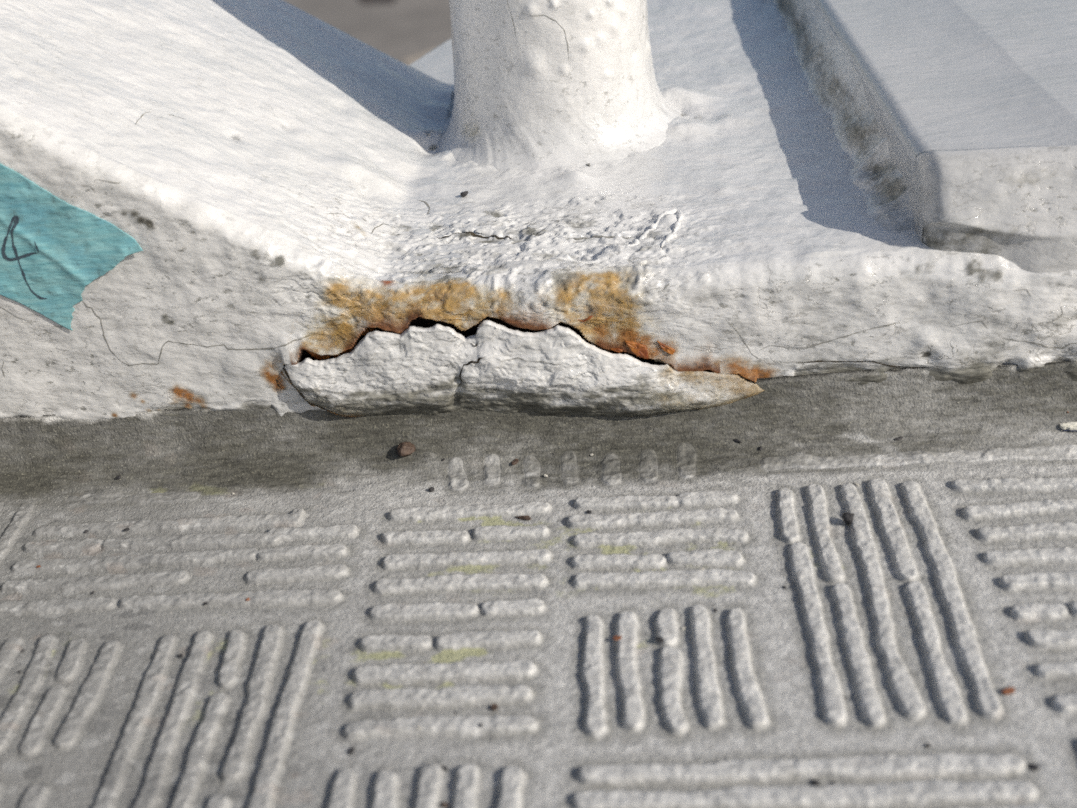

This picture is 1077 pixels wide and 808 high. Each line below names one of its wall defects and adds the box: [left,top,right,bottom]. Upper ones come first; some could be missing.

rust [172,387,205,408]
crack [83,302,676,412]
rust [263,280,551,391]
rust [556,271,774,404]
crack [704,322,928,383]